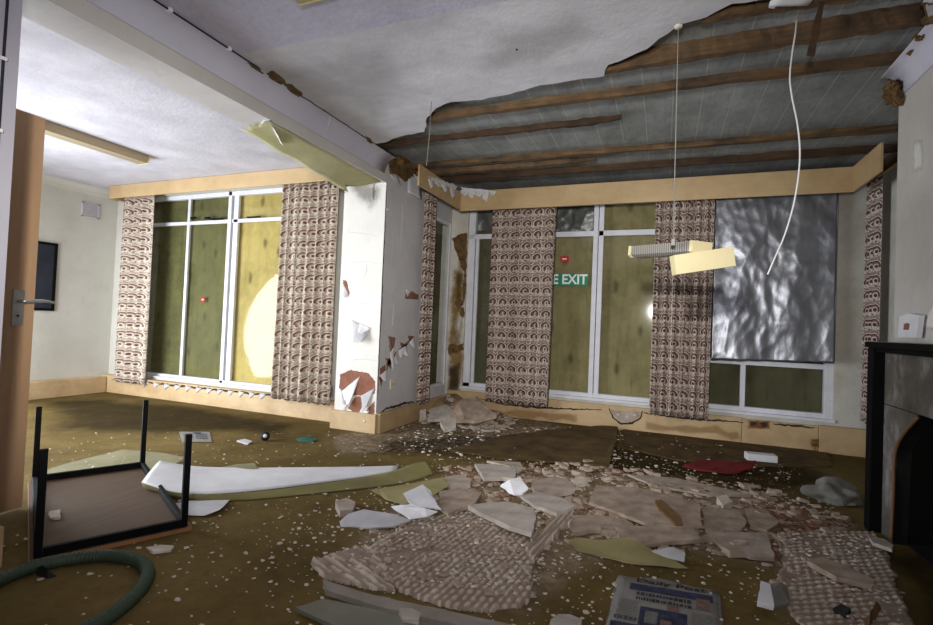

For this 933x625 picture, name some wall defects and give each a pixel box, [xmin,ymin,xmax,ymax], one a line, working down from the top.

peeling [768,0,812,9]
flaking render [904,0,933,56]
flaking render [881,78,904,107]
peeling [389,155,496,202]
peeling [405,288,419,300]
peeling [352,320,371,342]
damp [449,263,464,390]
peeling [339,335,415,422]